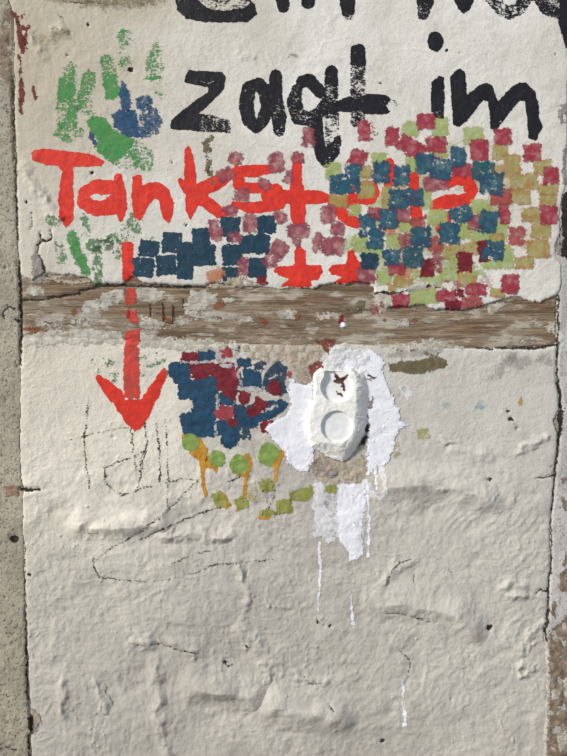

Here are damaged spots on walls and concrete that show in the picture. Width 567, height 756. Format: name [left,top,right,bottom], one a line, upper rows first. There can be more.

flaking render [24,251,90,298]
peeling [15,289,125,348]
flaking render [135,276,335,385]
flaking render [315,281,439,321]
peeling [374,337,464,350]
peeling [529,318,559,335]
crack [536,435,560,642]
crack [22,541,30,701]